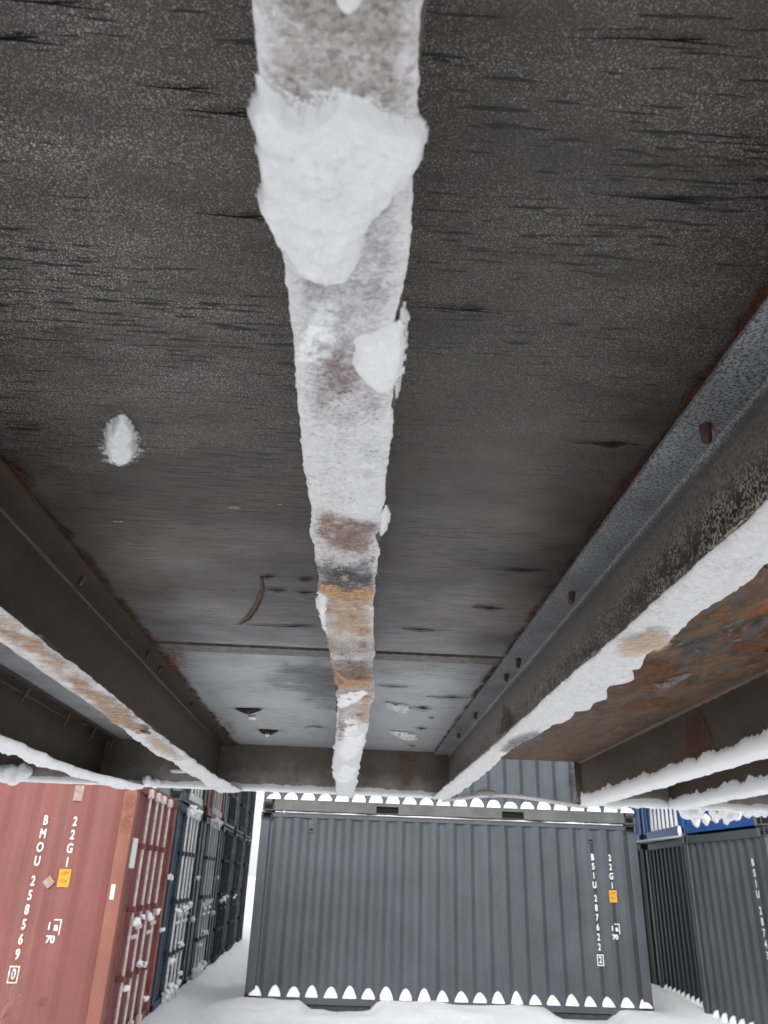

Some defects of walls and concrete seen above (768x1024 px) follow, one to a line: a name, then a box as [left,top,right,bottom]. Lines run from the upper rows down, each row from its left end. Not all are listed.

rust [729,286,768,344]
rust [584,354,723,544]
rust [315,514,376,554]
rust [1,615,180,760]
rust [59,527,239,745]
rust [319,576,373,740]
rust [435,558,577,752]
rust [619,631,679,686]